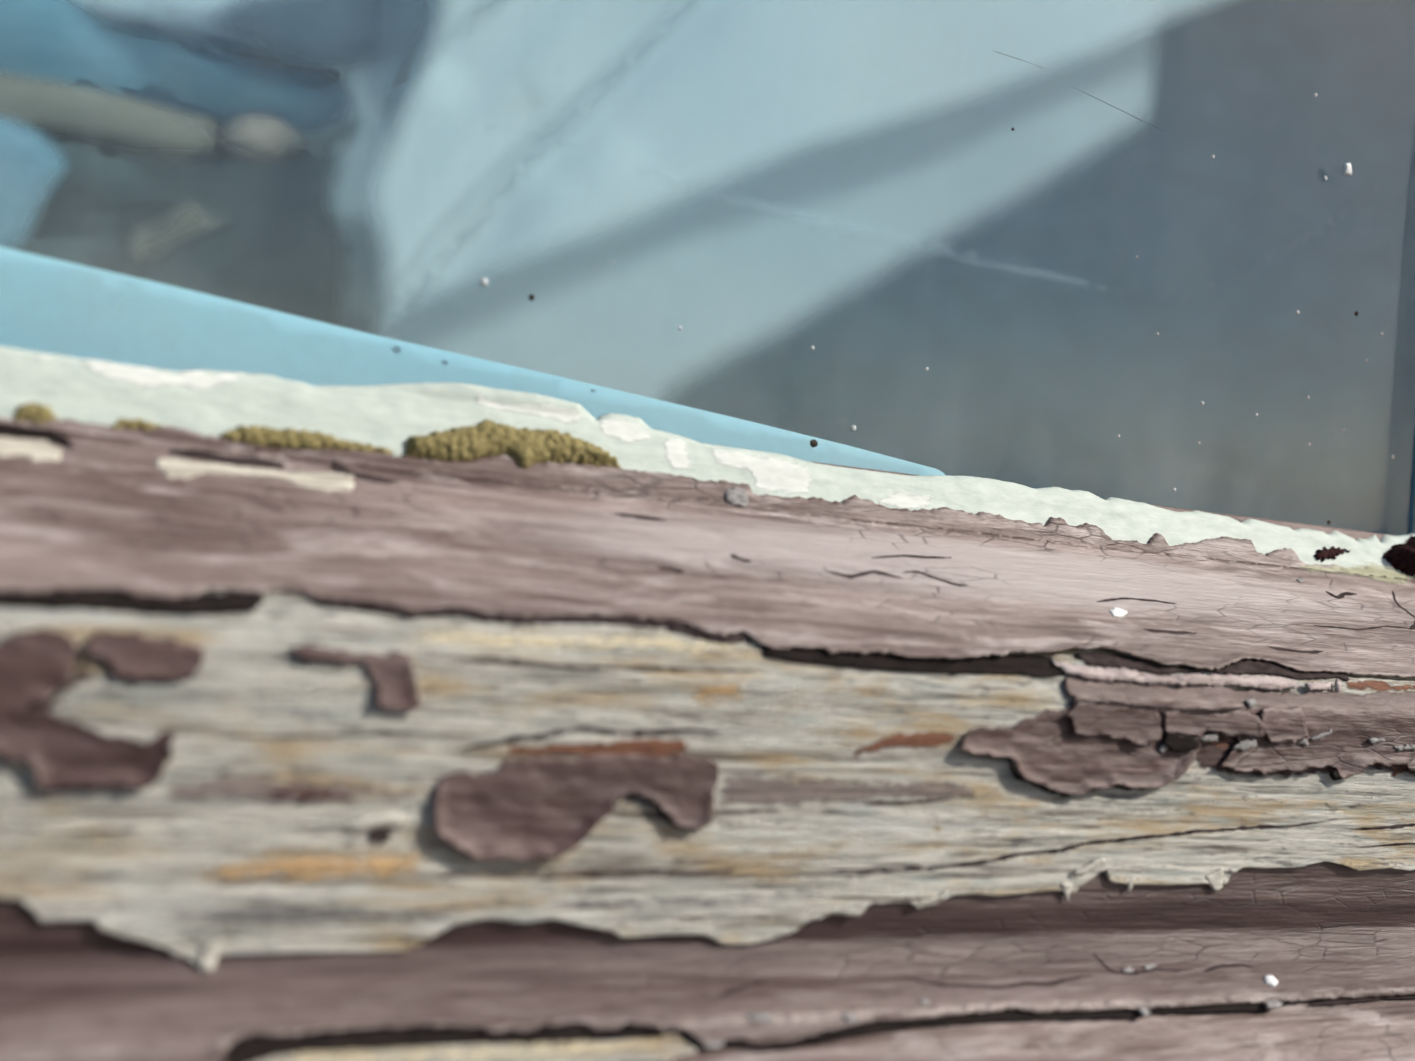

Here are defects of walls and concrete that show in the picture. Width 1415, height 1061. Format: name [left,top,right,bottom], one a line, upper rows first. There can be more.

crack [0,589,264,615]
crack [313,590,1415,753]
crack [210,726,720,750]
peeling [0,591,1415,972]
crack [223,953,1415,1061]